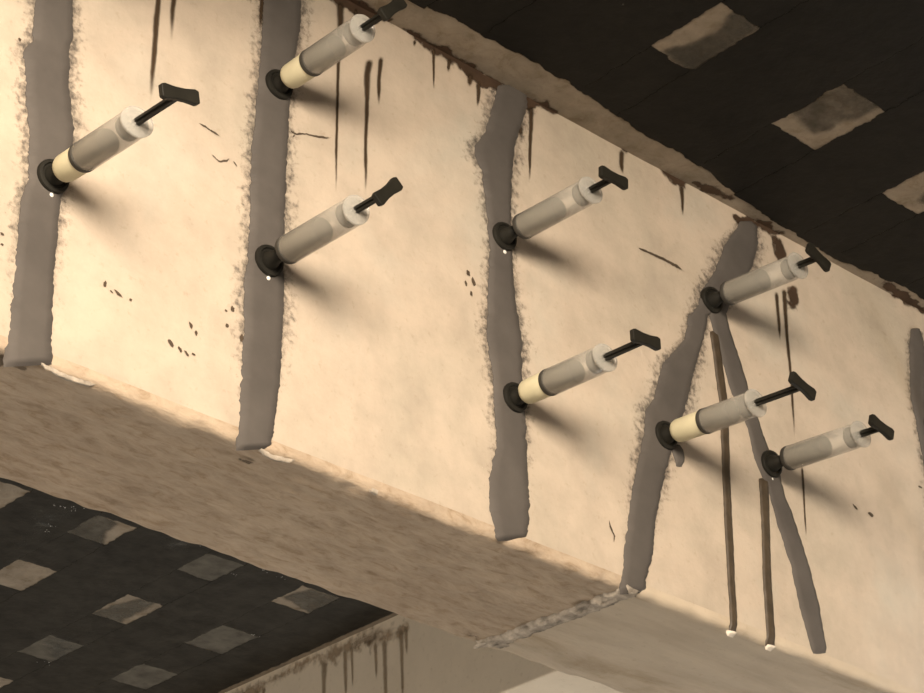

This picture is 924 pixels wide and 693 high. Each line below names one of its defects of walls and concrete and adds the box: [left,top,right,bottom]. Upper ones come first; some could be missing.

rust [151,0,176,83]
rust [331,0,393,39]
rust [403,28,504,103]
rust [364,58,383,179]
rust [519,97,558,172]
rust [662,170,734,212]
rust [733,214,787,260]
rust [775,286,799,372]
rust [883,282,924,314]
leakage [243,626,408,693]